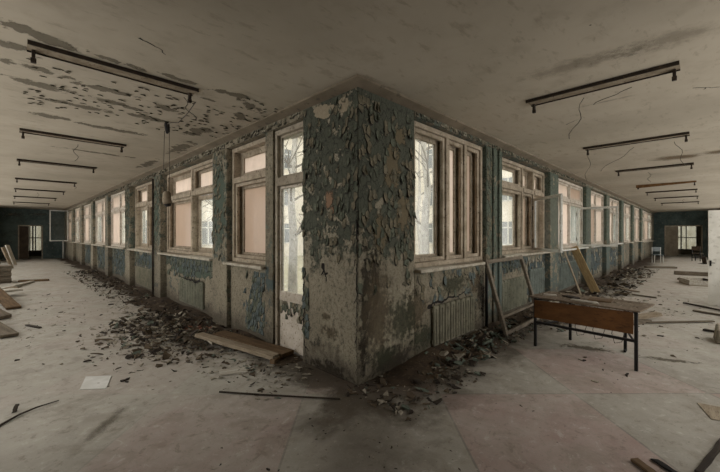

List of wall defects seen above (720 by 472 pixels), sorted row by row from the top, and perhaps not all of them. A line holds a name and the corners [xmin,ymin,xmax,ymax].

peeling [0,20,76,51]
flaking render [0,40,493,302]
peeling [243,270,265,336]
peeling [280,267,310,340]